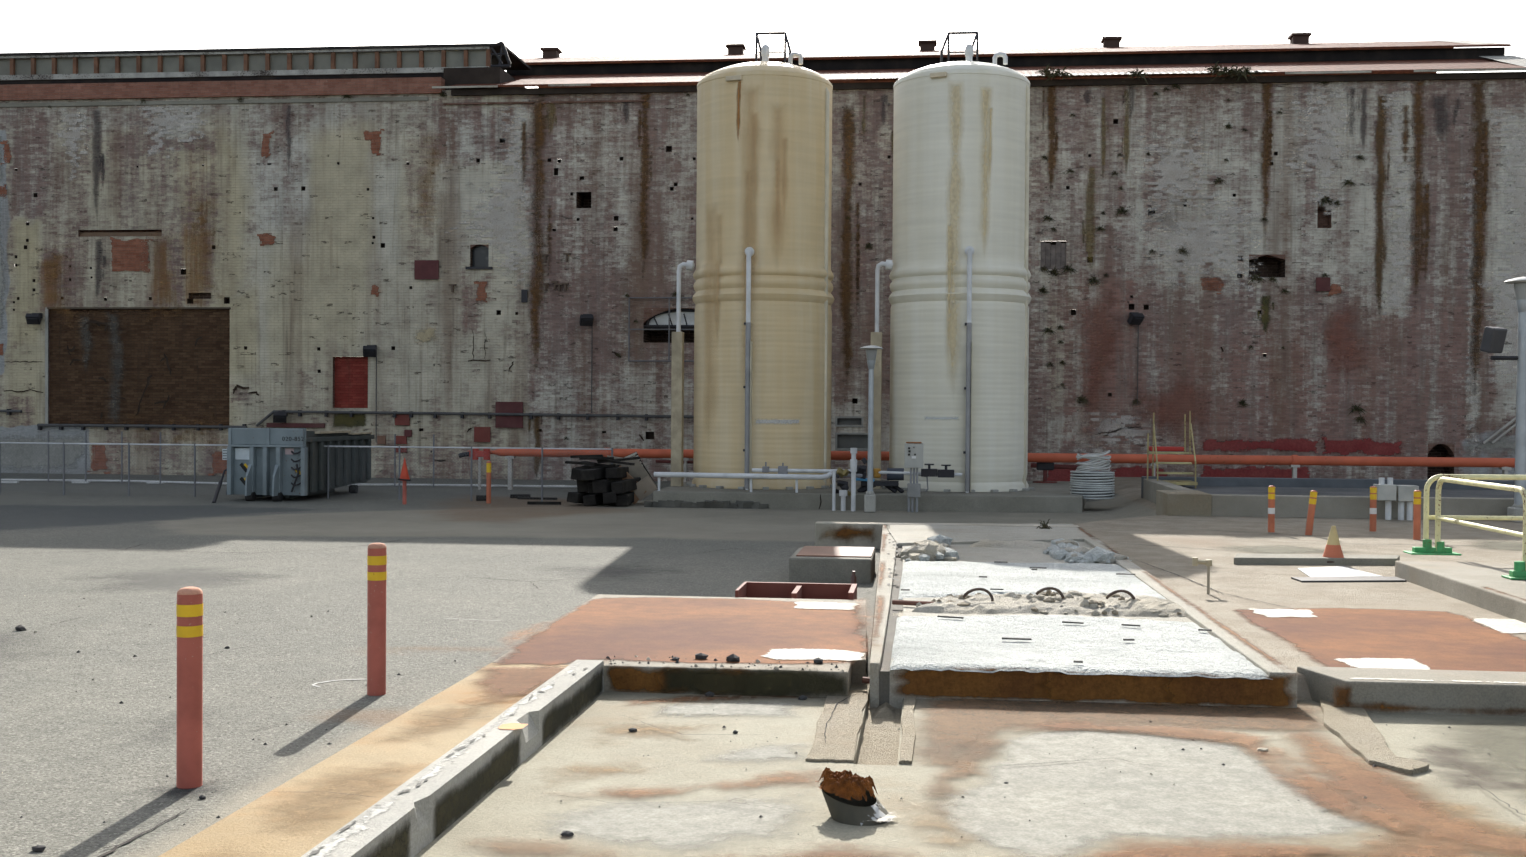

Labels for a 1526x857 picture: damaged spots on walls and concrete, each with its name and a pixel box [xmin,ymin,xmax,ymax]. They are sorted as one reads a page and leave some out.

leakage [456,108,536,287]
leakage [1286,88,1418,314]
leakage [1464,108,1526,421]
rust [479,524,887,704]
crack [97,809,188,857]
rust [722,767,879,801]
rust [897,572,1526,857]